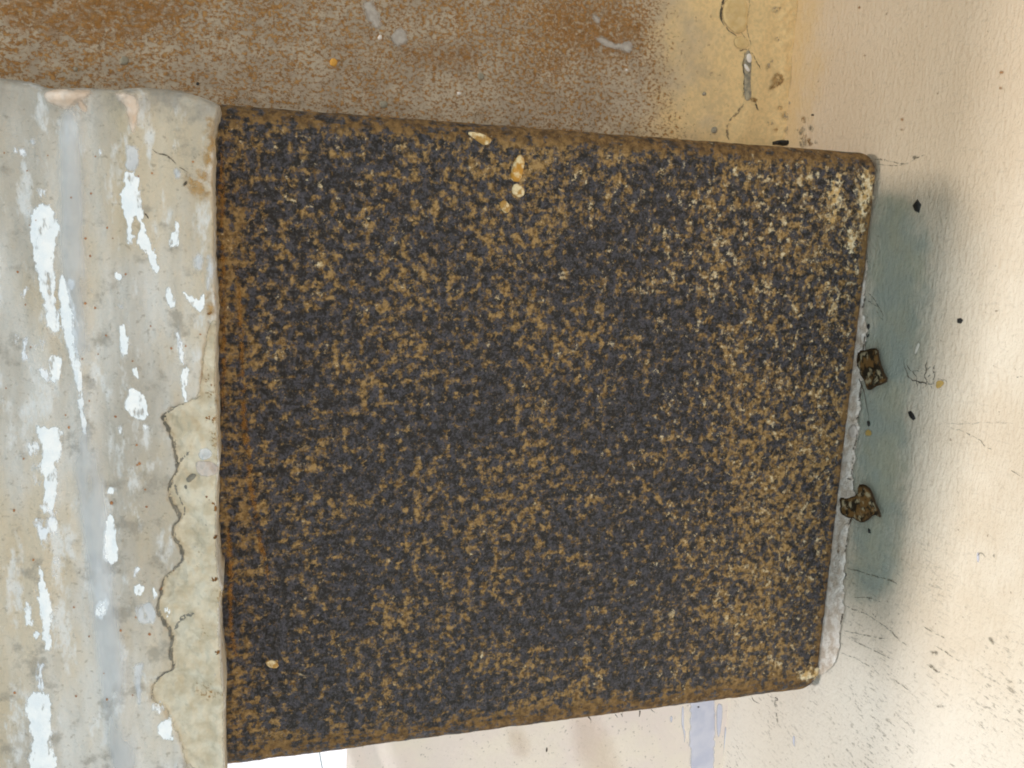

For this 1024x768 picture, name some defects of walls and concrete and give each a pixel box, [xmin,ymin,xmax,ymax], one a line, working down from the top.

rust [0,0,687,139]
crack [720,0,760,140]
efflorescence [843,229,857,253]
efflorescence [826,170,875,223]
rust [205,245,242,439]
spalling [152,321,224,768]
rust [212,528,237,656]